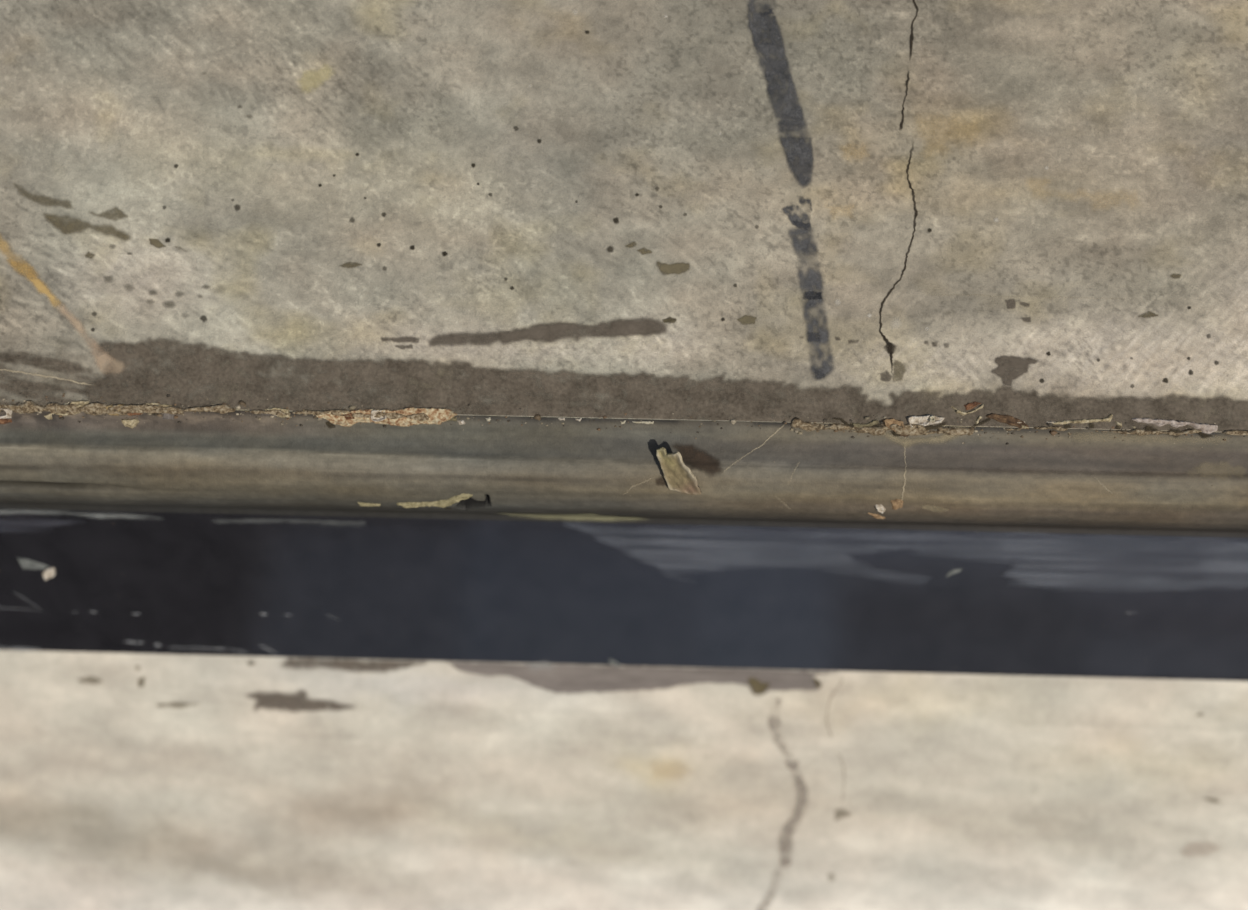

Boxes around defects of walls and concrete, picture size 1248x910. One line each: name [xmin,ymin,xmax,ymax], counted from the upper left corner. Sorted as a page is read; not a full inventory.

crack [879,0,918,367]
water stain [0,339,1248,432]
spalling [0,400,465,428]
peeling [790,401,1248,446]
spalling [656,446,720,495]